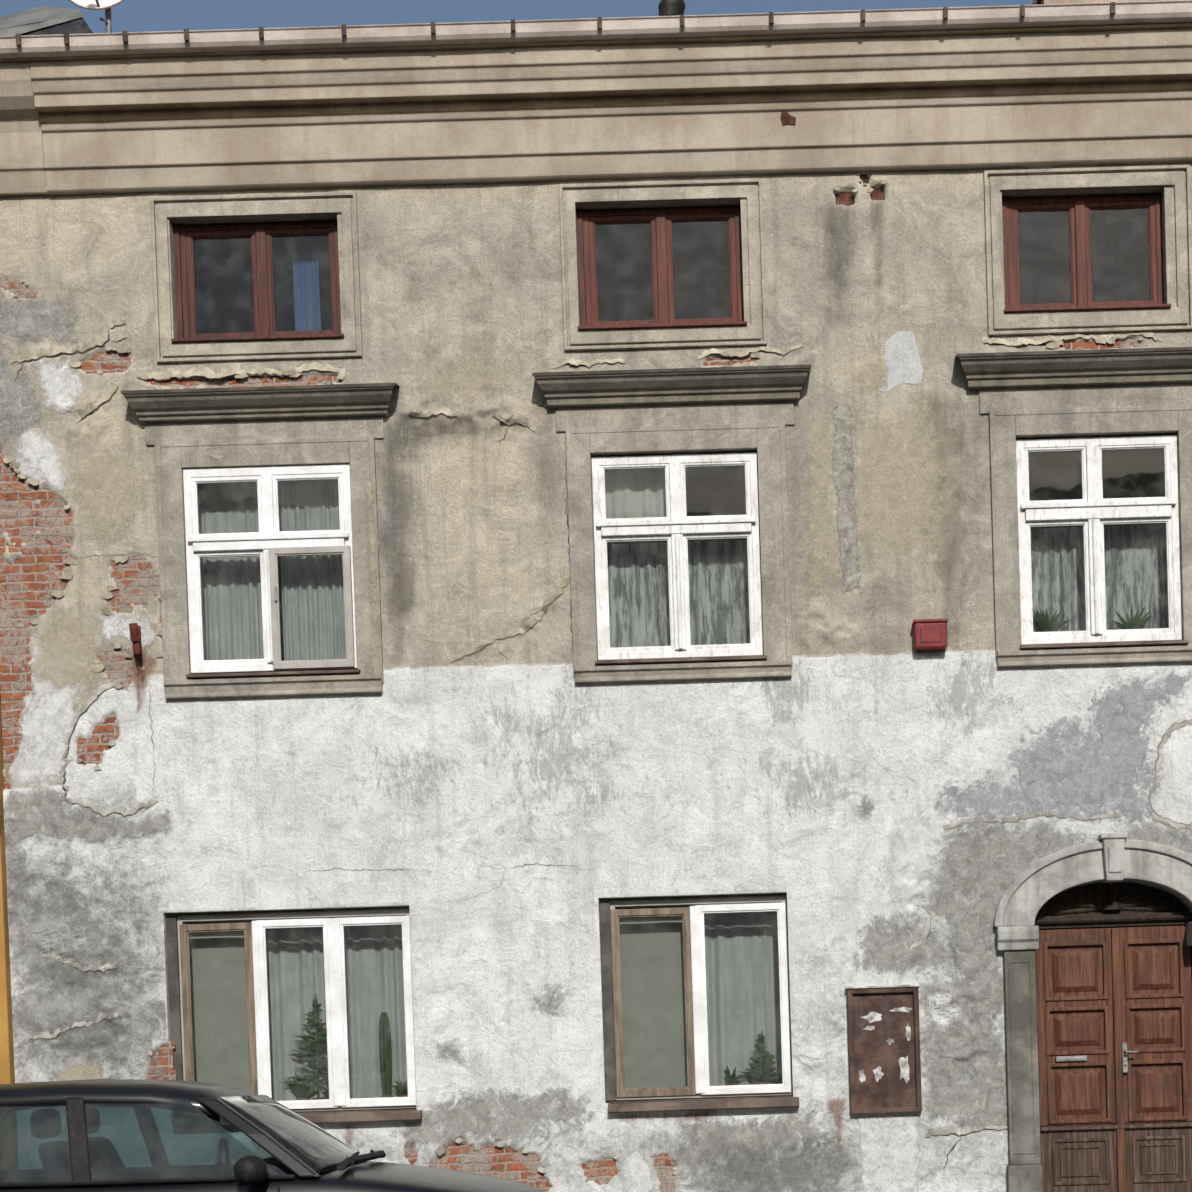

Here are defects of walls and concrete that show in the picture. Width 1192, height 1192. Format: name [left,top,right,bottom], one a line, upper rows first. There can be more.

spalling [834,174,885,206]
peeling [0,277,77,345]
crack [10,317,127,379]
spalling [703,352,760,367]
peeling [879,331,924,392]
spalling [1046,335,1149,350]
spalling [0,346,345,846]
crack [446,461,573,663]
crack [58,678,158,817]
leakage [936,671,1191,824]
crack [941,719,1192,868]
peeling [370,1087,594,1192]